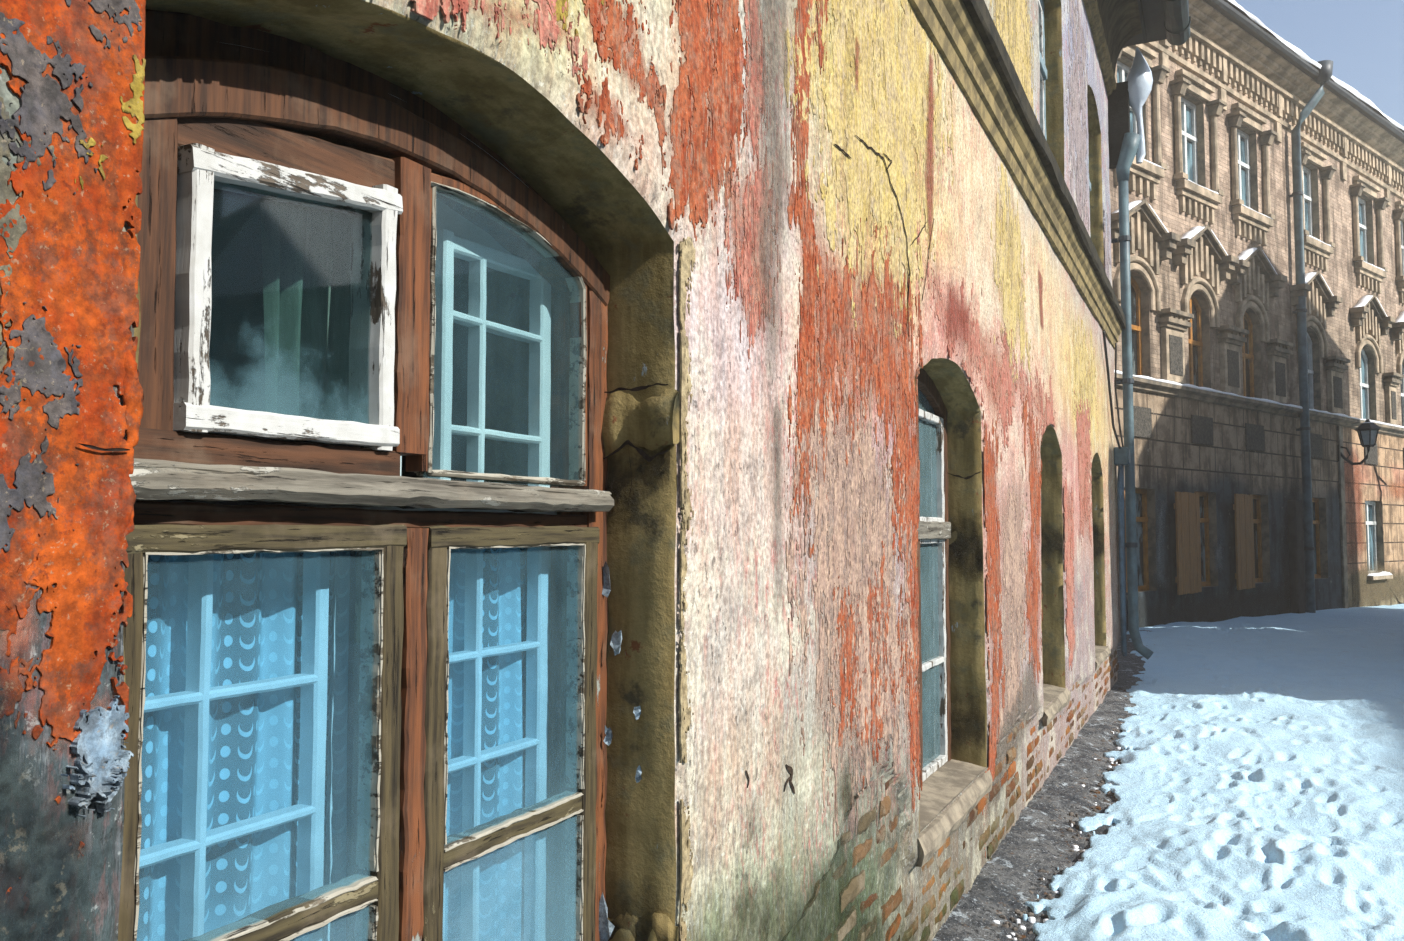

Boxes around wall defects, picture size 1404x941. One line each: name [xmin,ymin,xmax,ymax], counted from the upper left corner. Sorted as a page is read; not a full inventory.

crack [834,135,934,337]
peeling [0,0,146,818]
crack [604,383,668,393]
peeling [410,0,1119,941]
damp [0,680,85,941]